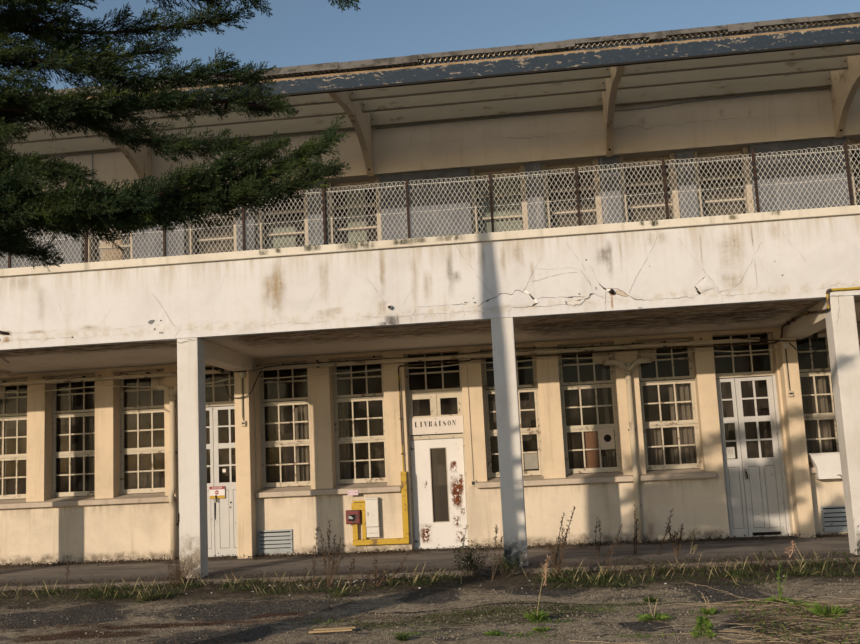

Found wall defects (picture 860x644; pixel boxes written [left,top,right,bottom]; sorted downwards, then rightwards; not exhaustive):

crack [362,242,762,321]
corrosion [451,461,464,542]